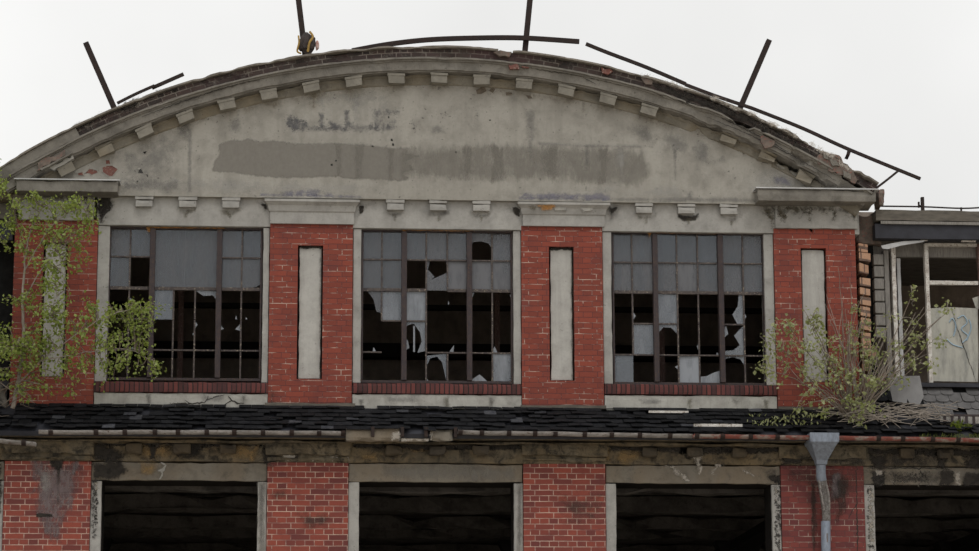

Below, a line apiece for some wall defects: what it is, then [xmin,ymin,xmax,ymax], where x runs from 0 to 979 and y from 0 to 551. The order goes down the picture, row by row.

spalling [37,150,74,172]
spalling [75,158,119,178]
spalling [816,151,859,186]
damp [32,453,78,537]
peeling [90,479,100,538]
damp [666,456,721,481]
damp [869,455,912,487]
damp [939,471,979,487]